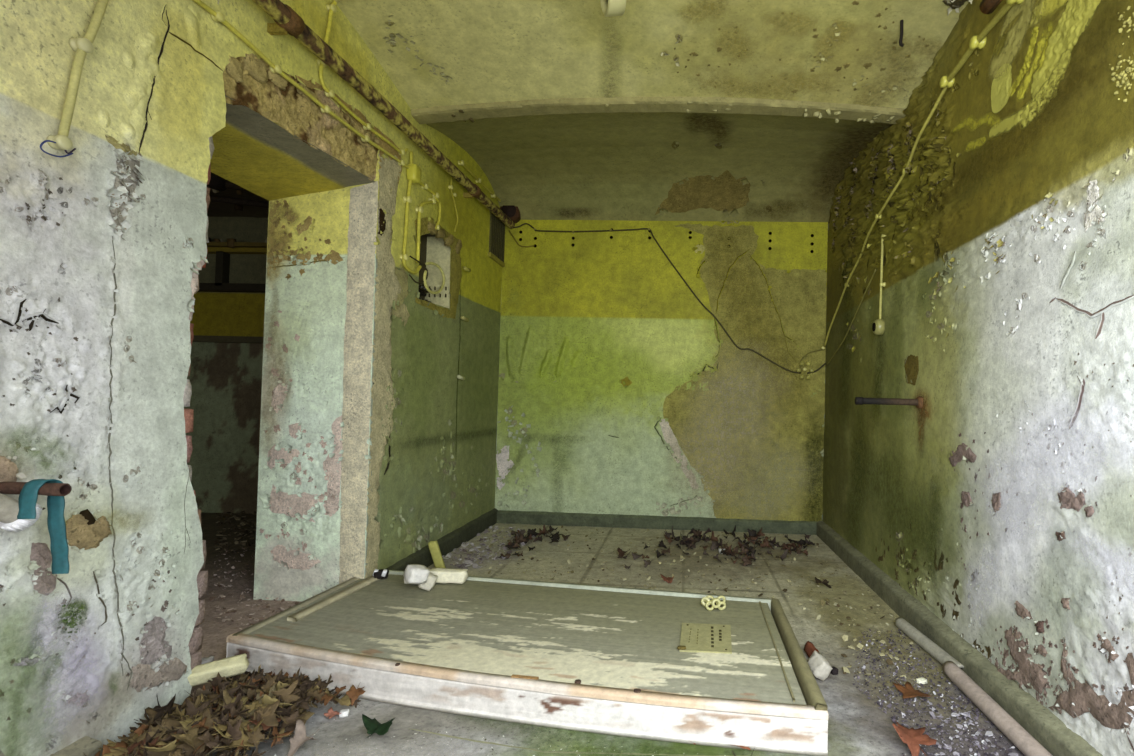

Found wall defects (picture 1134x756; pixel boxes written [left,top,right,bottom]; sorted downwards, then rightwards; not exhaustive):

crack [139,4,223,153]
peeling [810,8,911,100]
peeling [0,134,146,241]
crack [0,298,62,333]
peeling [260,76,462,584]
flaking render [655,48,979,522]
peeling [979,232,1014,284]
crack [49,385,81,414]
flaking render [0,428,112,553]
crack [56,236,133,690]
flaking render [875,419,1134,735]